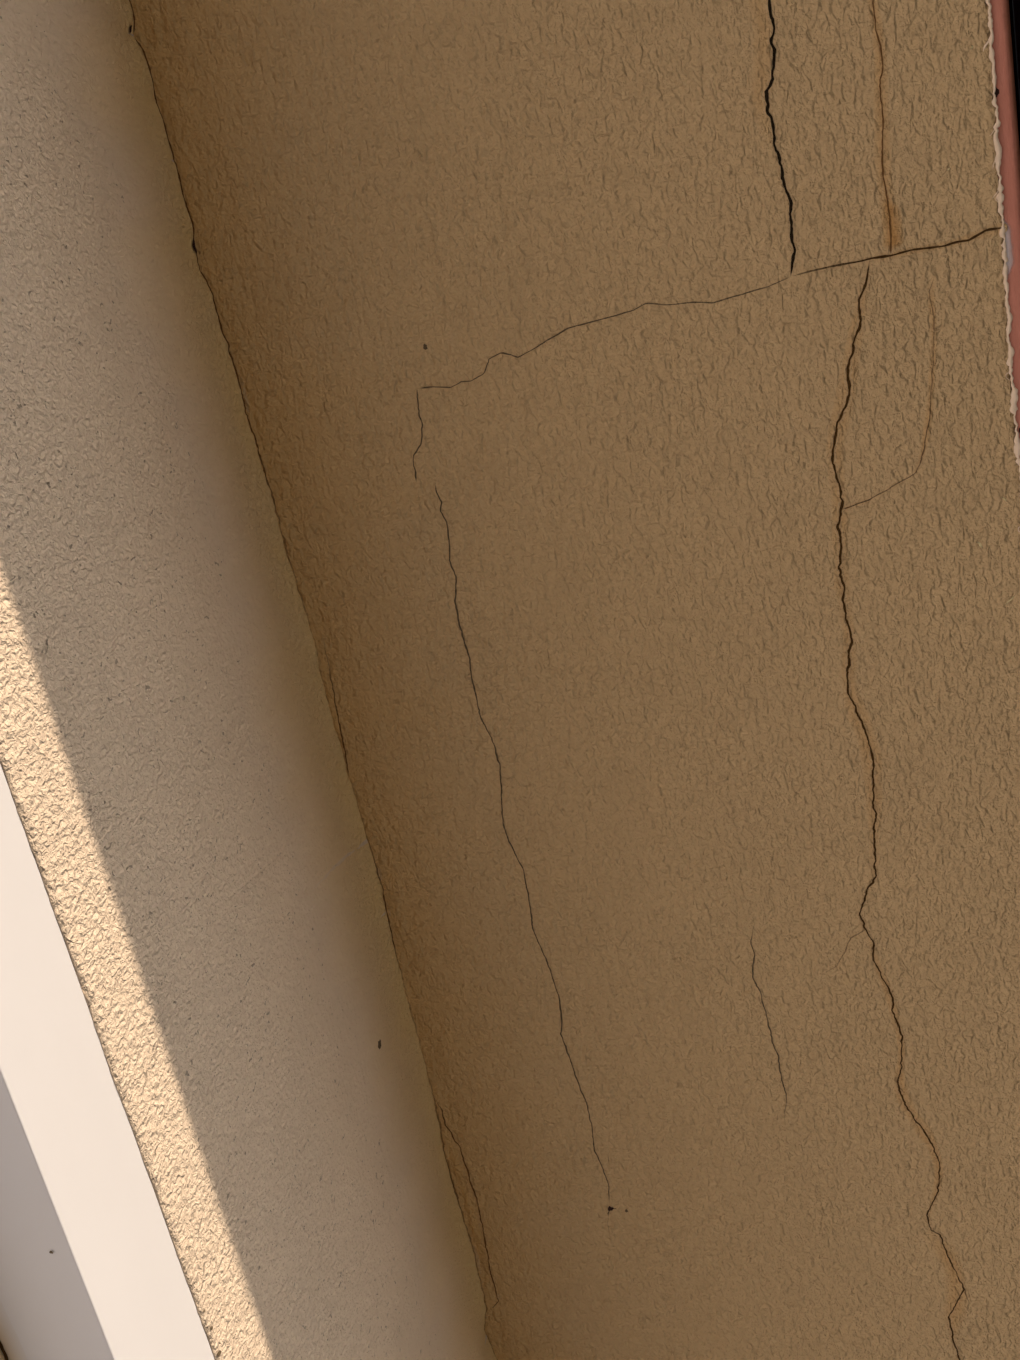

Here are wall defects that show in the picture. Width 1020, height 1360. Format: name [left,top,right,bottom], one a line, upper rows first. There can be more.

crack [129,0,286,543]
crack [329,674,349,773]
crack [372,854,396,955]
crack [413,0,1002,1360]